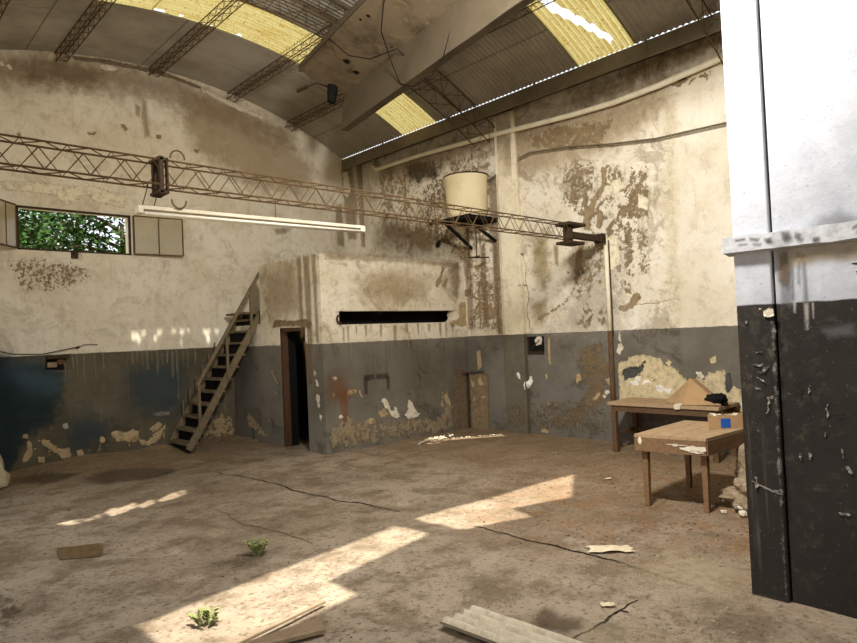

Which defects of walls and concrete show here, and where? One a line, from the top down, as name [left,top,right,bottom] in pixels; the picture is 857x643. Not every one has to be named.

peeling [539,161,651,328]
spalling [330,350,502,448]
peeling [507,332,742,434]
peeling [22,421,166,463]
crack [207,470,400,512]
crack [216,509,309,542]
crack [473,526,702,590]
crack [573,600,637,639]